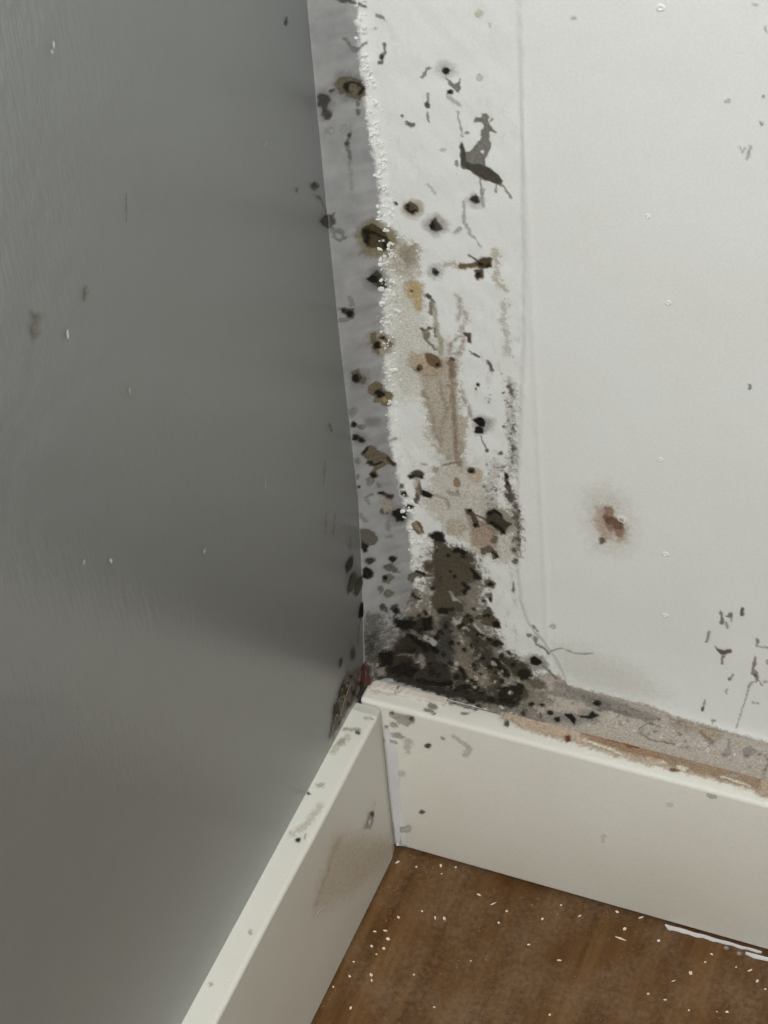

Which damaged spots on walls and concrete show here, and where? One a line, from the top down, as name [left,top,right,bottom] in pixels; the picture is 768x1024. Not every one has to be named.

leakage [317,77,365,120]
peeling [455,114,512,198]
peeling [354,0,403,425]
leakage [394,202,446,234]
peeling [421,294,442,355]
peeling [400,494,426,562]
leakage [321,214,768,780]
rust [595,507,626,544]